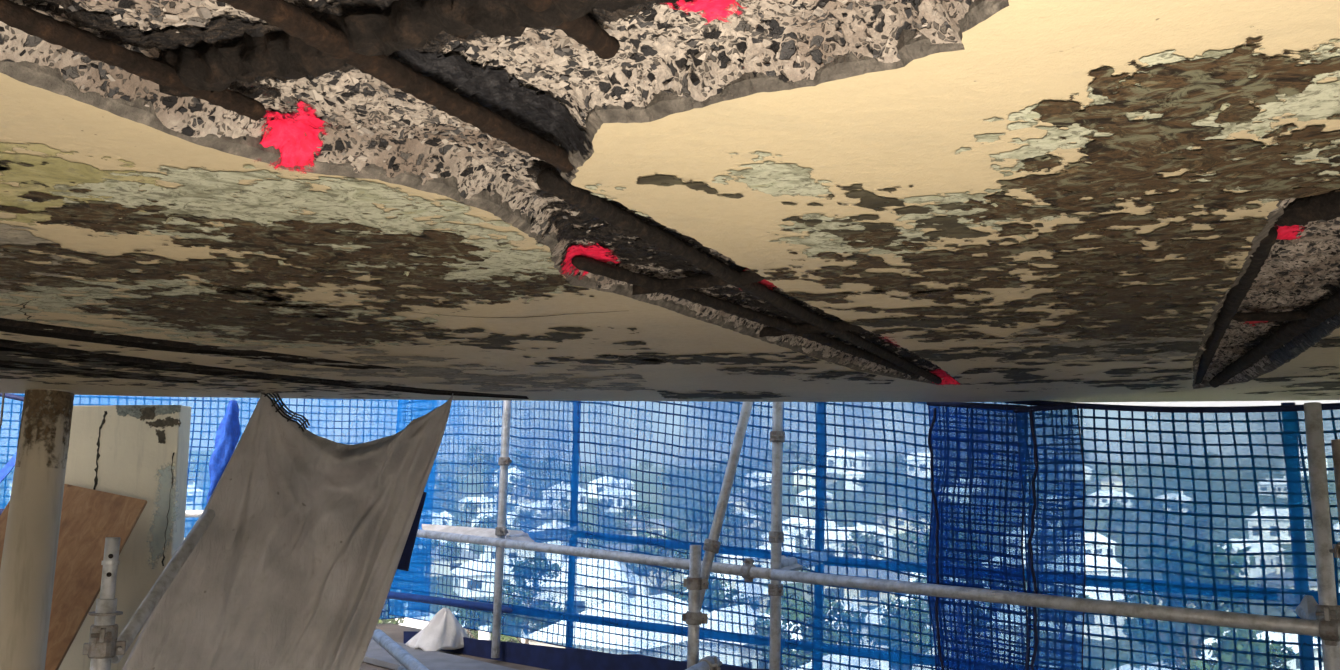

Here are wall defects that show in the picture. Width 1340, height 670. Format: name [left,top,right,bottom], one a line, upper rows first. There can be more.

spalling [0,0,1340,399]
damp [909,326,1207,393]
damp [1232,366,1340,396]
damp [1312,337,1340,348]
crack [93,411,107,490]